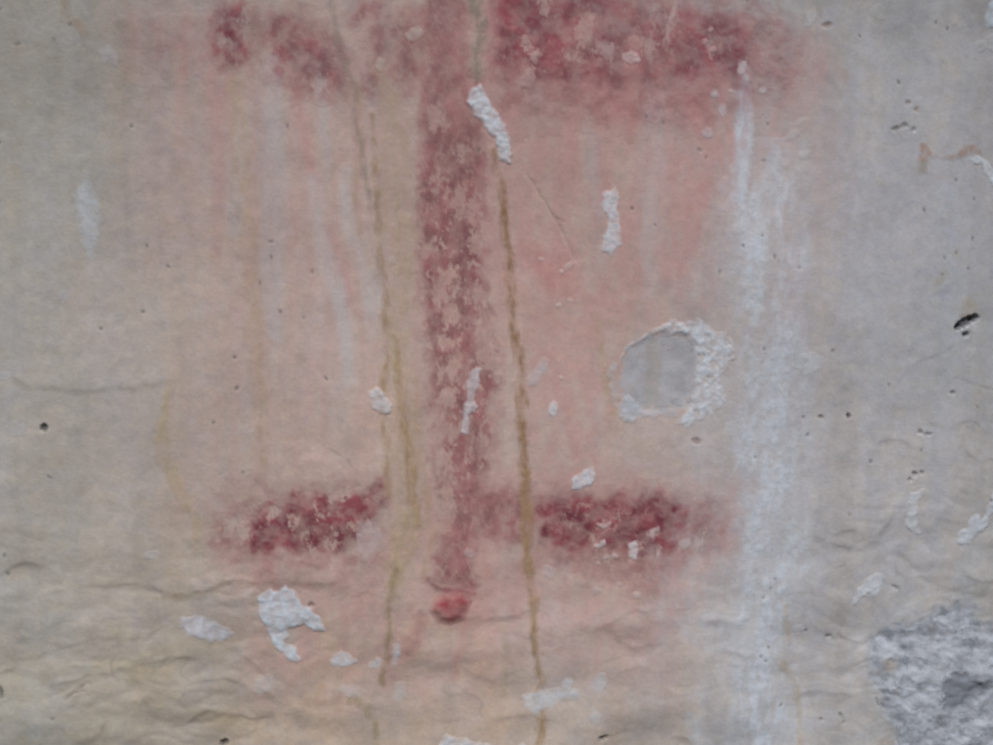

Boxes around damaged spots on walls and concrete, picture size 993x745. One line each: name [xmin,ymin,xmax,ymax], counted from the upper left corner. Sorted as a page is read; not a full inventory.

peeling [465,83,513,166]
peeling [599,186,623,258]
water stain [303,0,439,689]
spalling [605,318,739,446]
efflorescence [665,118,823,745]
peeling [955,491,993,549]
peeling [178,613,235,644]
peeling [236,583,327,663]
peeling [521,672,608,716]
spalling [856,595,993,745]